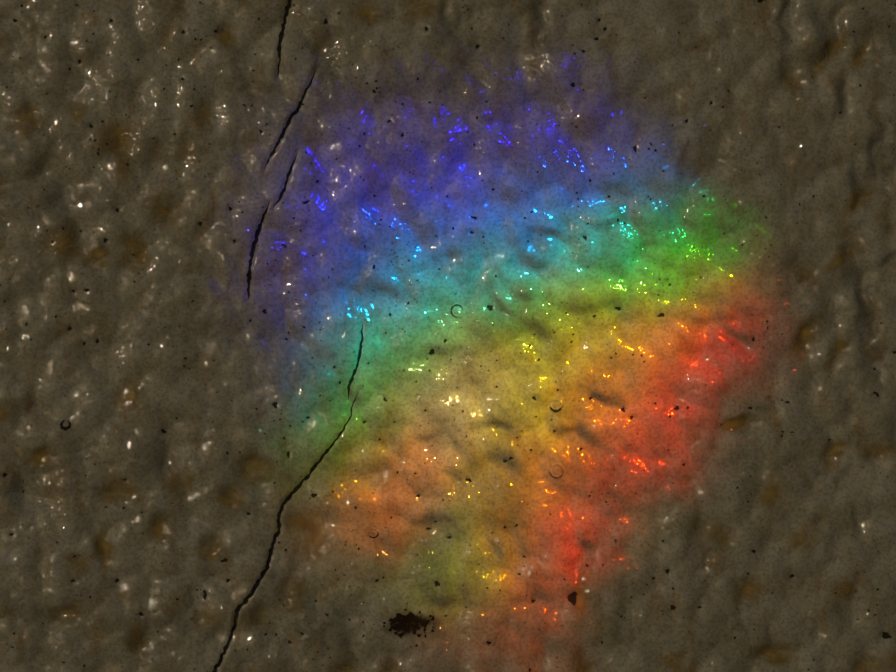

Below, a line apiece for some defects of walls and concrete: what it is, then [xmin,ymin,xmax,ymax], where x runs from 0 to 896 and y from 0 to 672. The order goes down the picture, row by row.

crack [277,0,292,76]
crack [246,69,316,299]
crack [212,324,364,672]